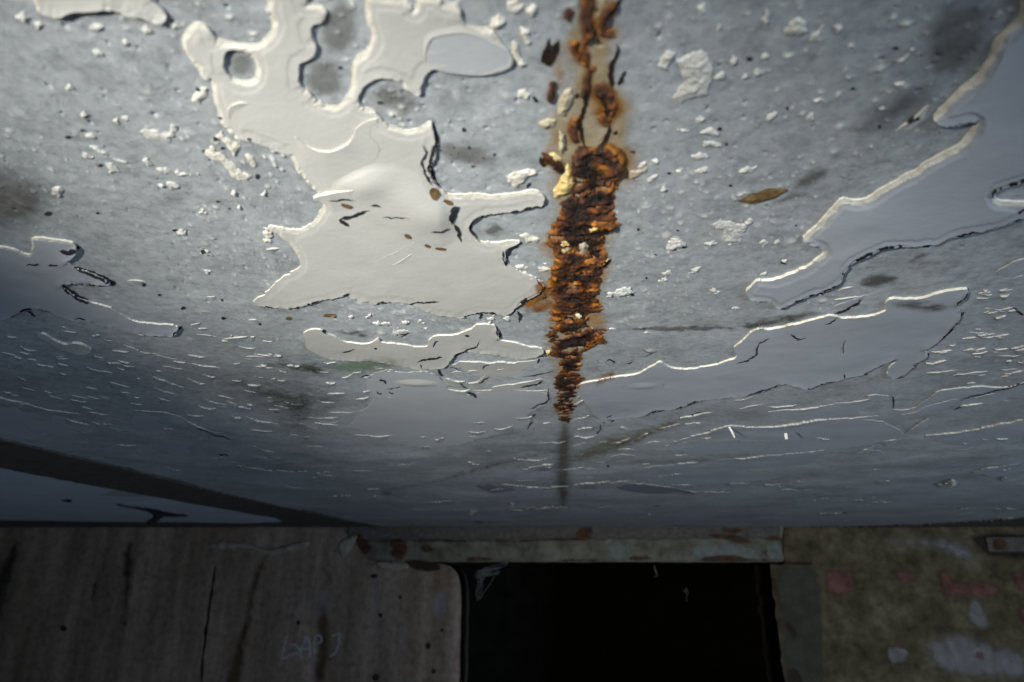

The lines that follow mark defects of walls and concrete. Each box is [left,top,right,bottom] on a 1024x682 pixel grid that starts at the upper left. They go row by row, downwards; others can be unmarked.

peeling [0,0,551,436]
corrosion [525,0,631,501]
peeling [570,0,1024,492]